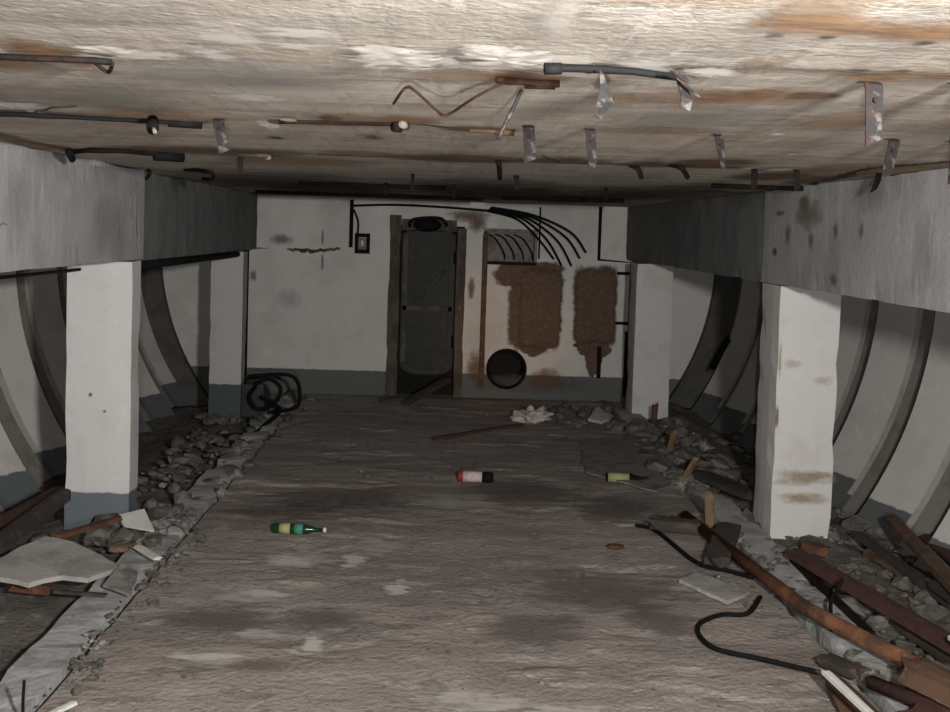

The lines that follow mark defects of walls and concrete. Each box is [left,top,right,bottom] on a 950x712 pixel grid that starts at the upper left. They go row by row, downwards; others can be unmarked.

rust [752,4,950,41]
rust [0,41,105,70]
rust [418,71,567,81]
rust [612,87,834,105]
peeling [493,262,618,377]